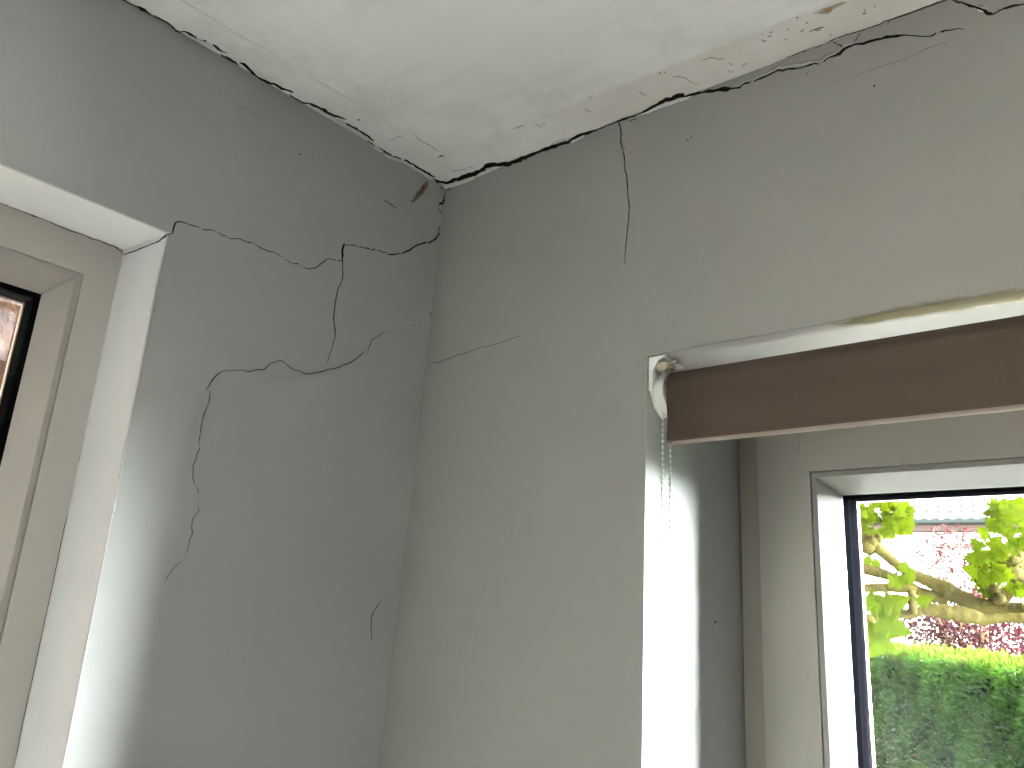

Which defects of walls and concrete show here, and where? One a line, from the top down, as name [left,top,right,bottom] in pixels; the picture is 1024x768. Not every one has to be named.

crack [123,0,1024,581]